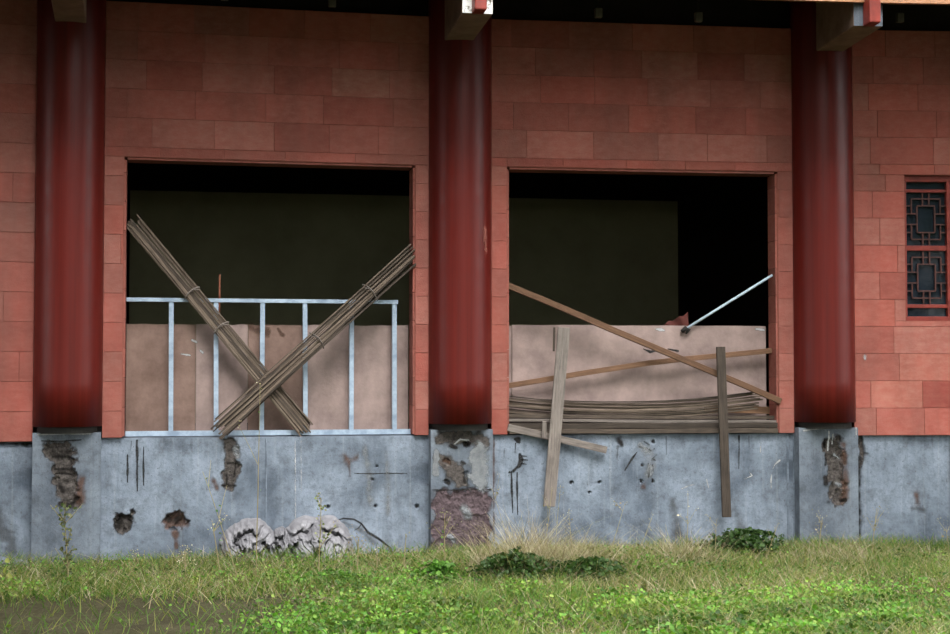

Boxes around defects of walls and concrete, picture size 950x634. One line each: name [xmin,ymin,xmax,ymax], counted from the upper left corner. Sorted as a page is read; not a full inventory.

spalling [0,433,91,508]
spalling [113,509,135,535]
spalling [212,437,242,492]
peeling [431,430,493,553]
spalling [803,427,865,537]